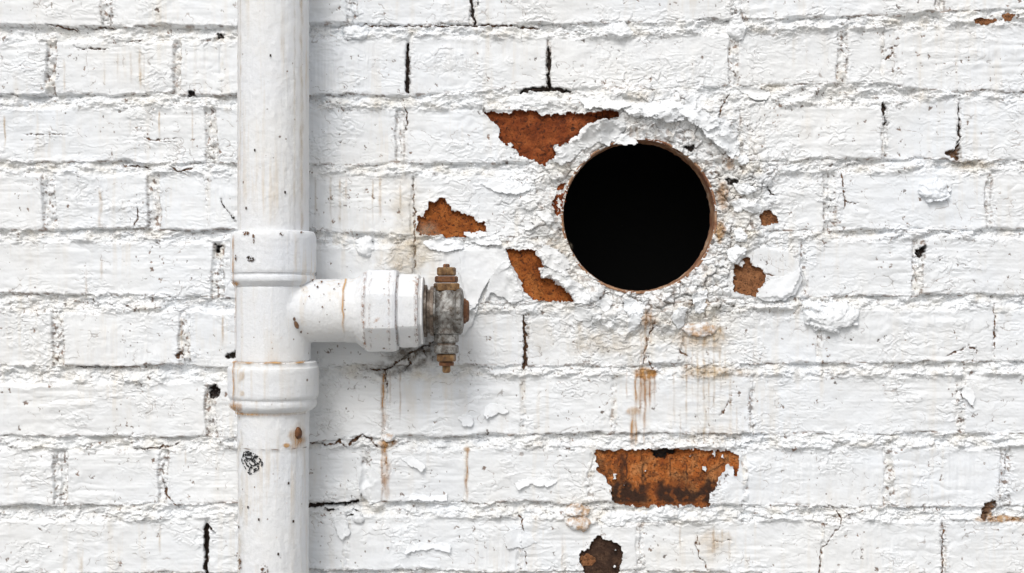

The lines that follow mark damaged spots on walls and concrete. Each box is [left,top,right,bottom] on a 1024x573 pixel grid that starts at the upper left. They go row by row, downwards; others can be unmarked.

spalling [416,94,749,336]
peeling [725,178,778,226]
peeling [726,228,802,301]
crack [370,342,433,385]
corrosion [635,368,656,401]
crack [310,434,378,447]
flaking render [594,448,739,508]
flaking render [579,535,623,573]